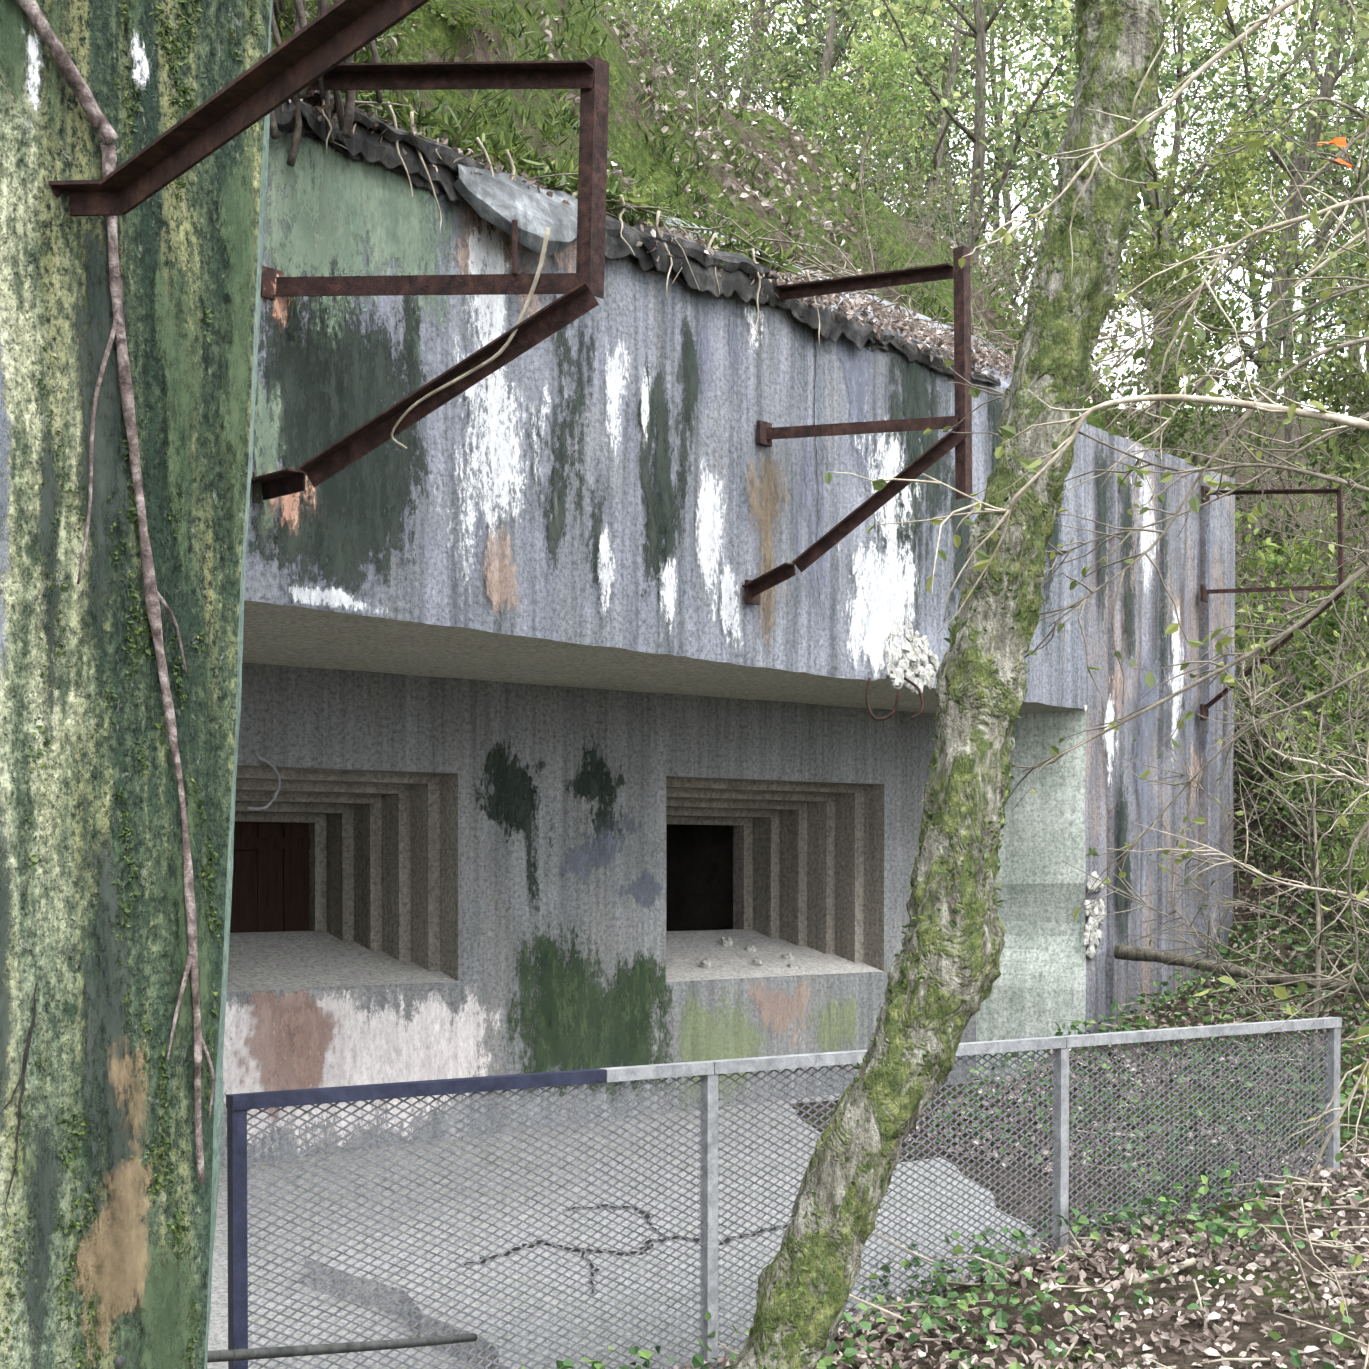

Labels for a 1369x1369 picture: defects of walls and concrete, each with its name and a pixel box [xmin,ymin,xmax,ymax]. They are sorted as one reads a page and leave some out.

leakage [153,128,509,611]
leakage [729,304,766,391]
leakage [457,307,741,646]
corrosion [746,454,789,643]
leakage [797,441,836,604]
leakage [1097,436,1236,945]
leakage [474,740,553,909]
leakage [559,735,642,883]
leakage [619,870,662,907]